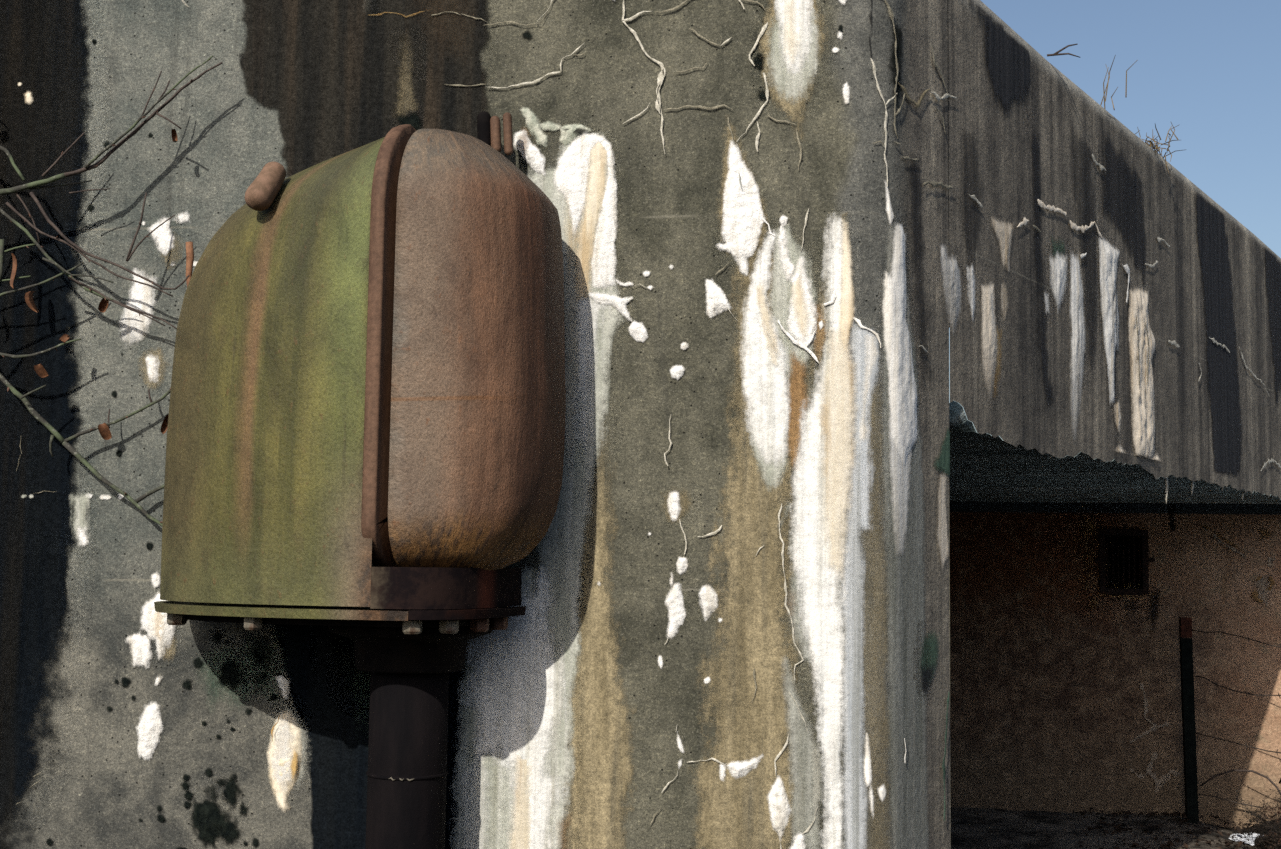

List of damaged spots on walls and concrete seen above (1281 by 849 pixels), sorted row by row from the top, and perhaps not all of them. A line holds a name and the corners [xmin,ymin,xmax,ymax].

water stain [240,0,489,177]
crack [444,43,585,89]
crack [622,0,797,153]
water stain [0,0,124,849]
water stain [445,133,633,849]
water stain [696,117,931,849]
peeling [115,593,174,759]
peeling [267,675,306,811]
peeling [665,557,688,638]
crack [650,727,725,824]
peeling [699,585,717,620]
crack [774,734,789,774]